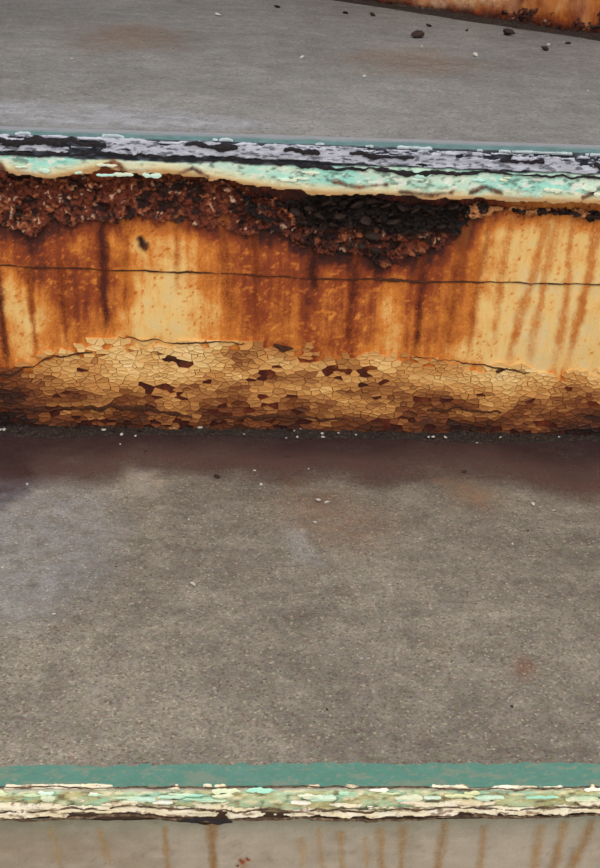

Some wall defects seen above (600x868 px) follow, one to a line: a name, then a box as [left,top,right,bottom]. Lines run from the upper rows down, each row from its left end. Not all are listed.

corrosion [365,0,600,33]
corrosion [67,168,145,183]
peeling [0,131,600,182]
spalling [0,163,600,269]
crack [0,264,600,285]
corrosion [0,173,600,391]
crack [0,336,600,436]
peeling [0,783,600,819]